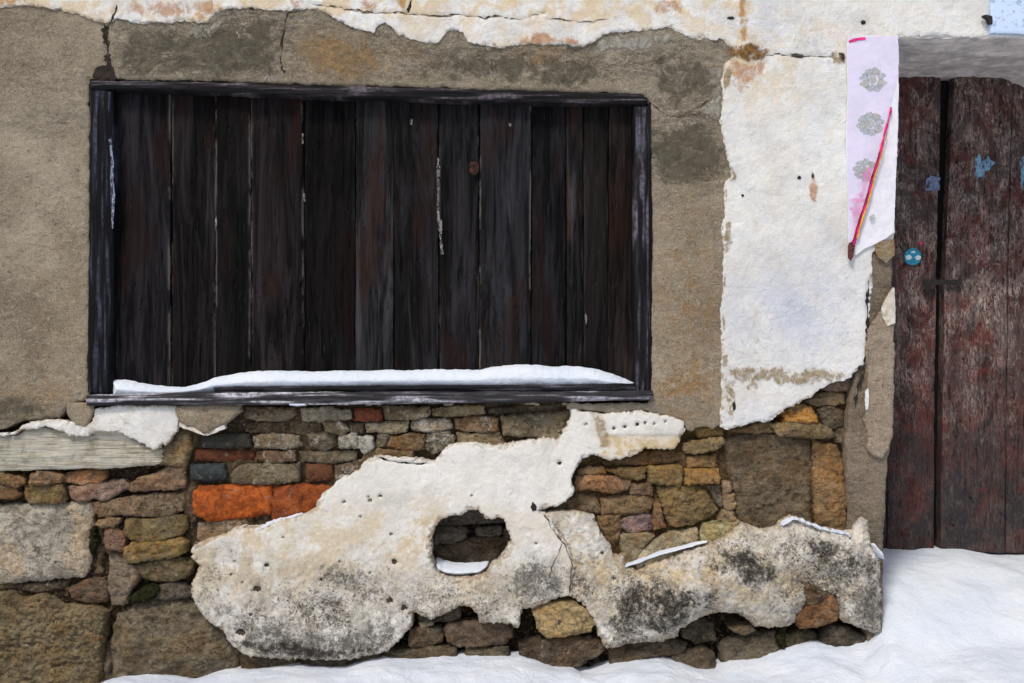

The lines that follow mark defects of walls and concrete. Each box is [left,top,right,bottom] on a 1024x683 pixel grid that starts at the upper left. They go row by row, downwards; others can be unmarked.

flaking render [93,65,117,81]
crack [101,5,117,67]
crack [280,0,603,75]
flaking render [546,355,851,570]
flaking render [0,401,866,683]
crack [536,509,573,597]
damp [604,581,719,638]
damp [711,543,777,593]
damp [804,533,879,626]